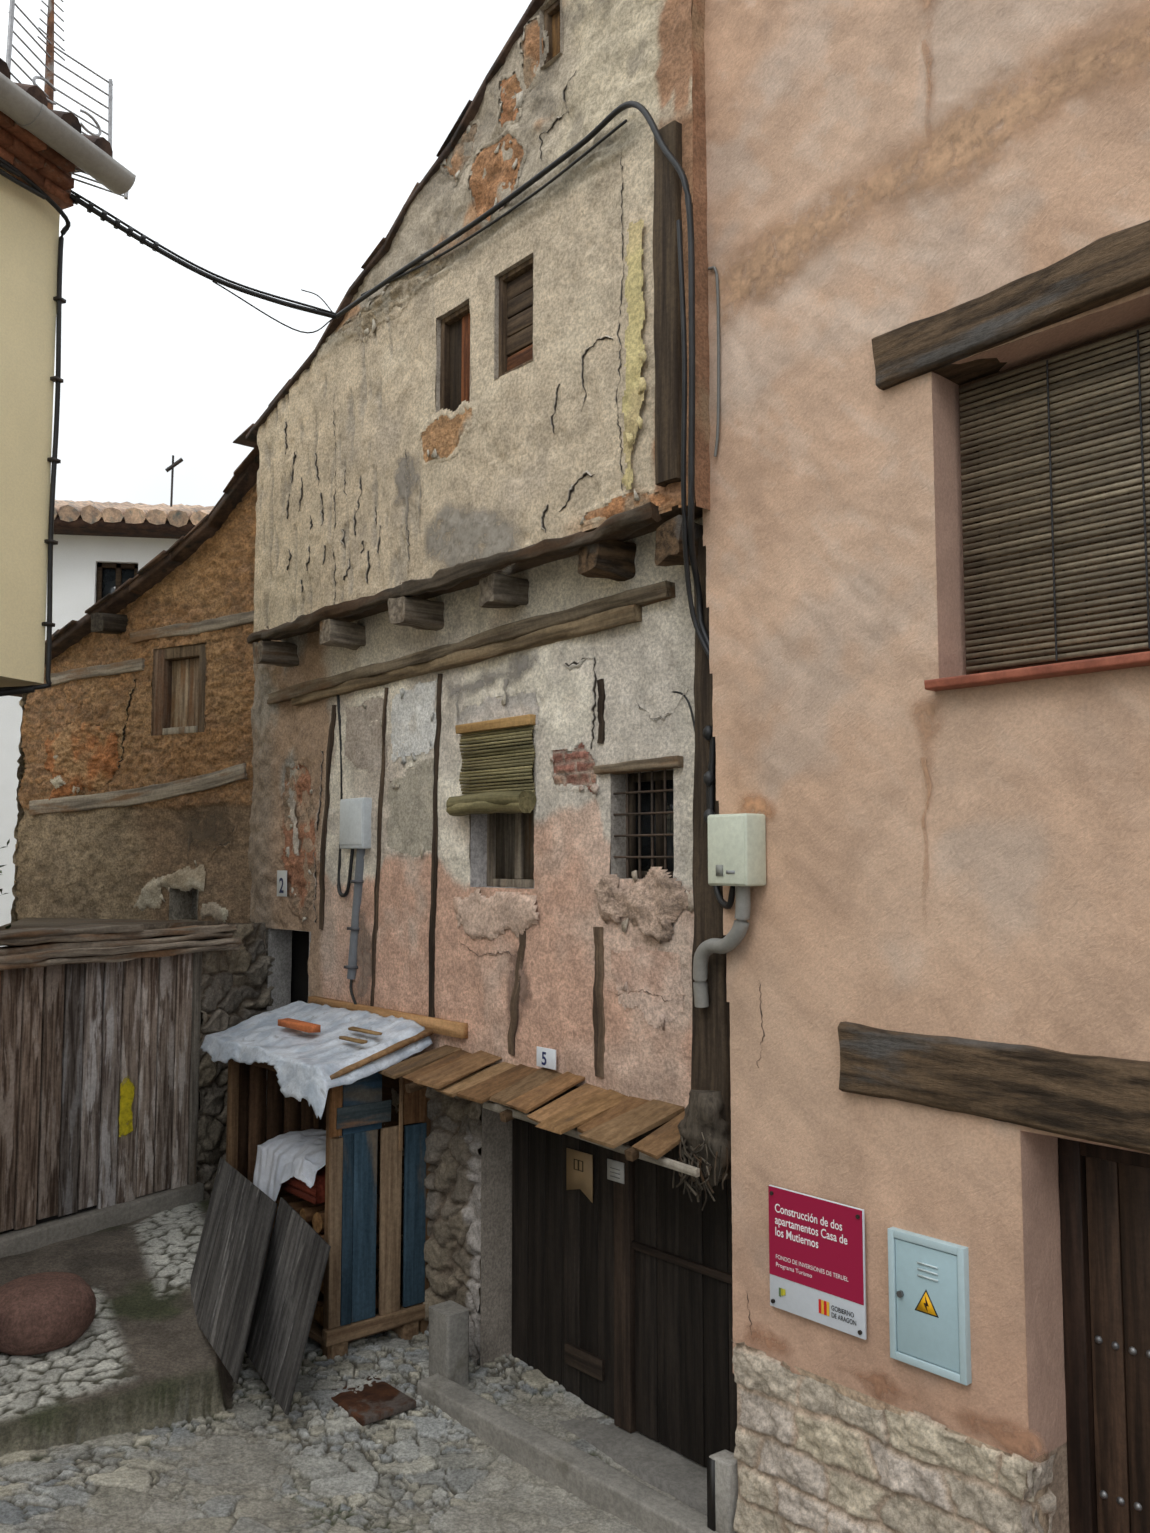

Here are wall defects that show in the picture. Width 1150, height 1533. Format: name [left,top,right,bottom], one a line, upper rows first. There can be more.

spalling [440,14,549,230]
crack [540,144,624,533]
spalling [418,400,478,470]
flaking render [342,678,544,864]
spalling [549,737,600,800]